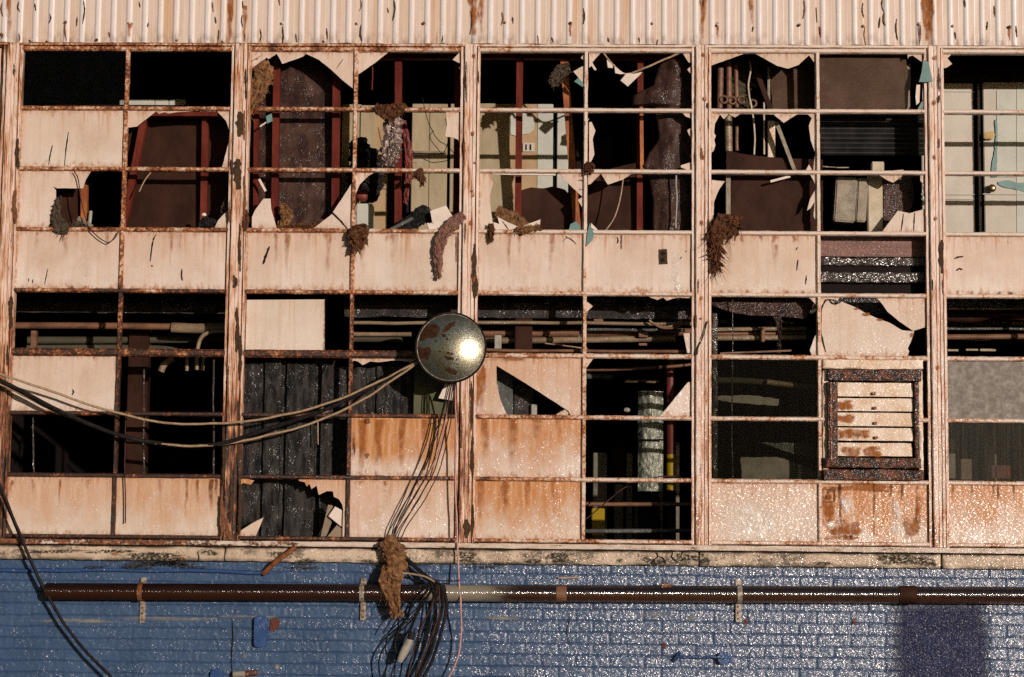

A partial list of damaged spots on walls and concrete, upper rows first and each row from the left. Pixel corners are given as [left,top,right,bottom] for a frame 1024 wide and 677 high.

rust [228,0,247,37]
rust [468,0,484,34]
rust [918,0,934,44]
rust [353,419,384,459]
rust [186,479,218,498]
rust [822,484,904,540]
rust [904,486,921,536]